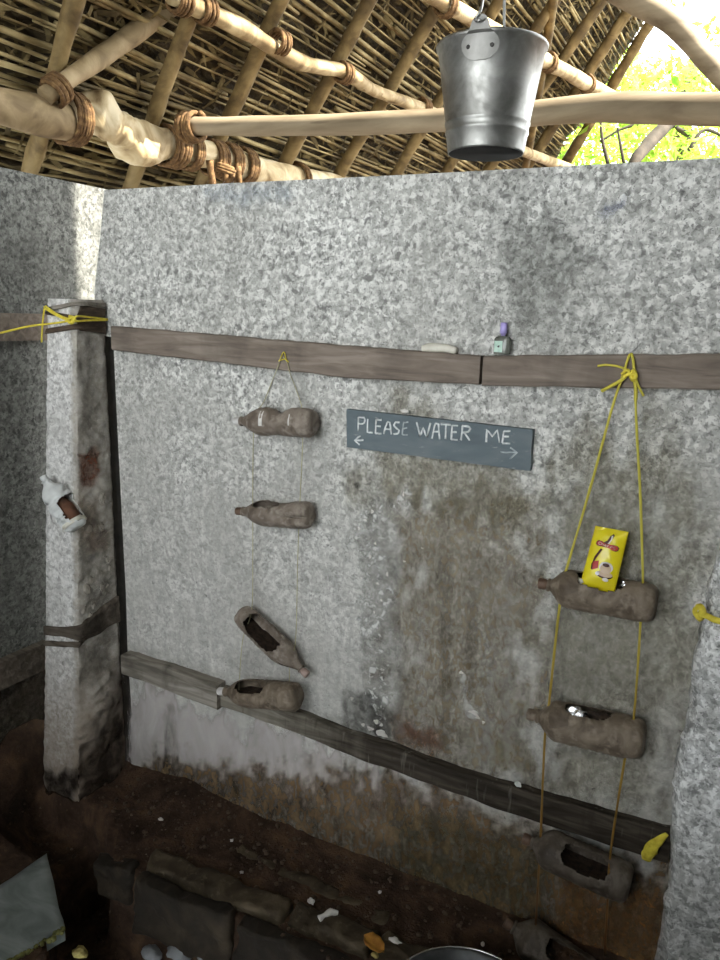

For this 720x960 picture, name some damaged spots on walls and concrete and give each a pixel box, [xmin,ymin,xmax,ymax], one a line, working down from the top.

corrosion [77,450,100,486]
peeling [349,485,412,710]
damp [346,443,697,784]
damp [44,679,125,802]
damp [142,748,671,960]